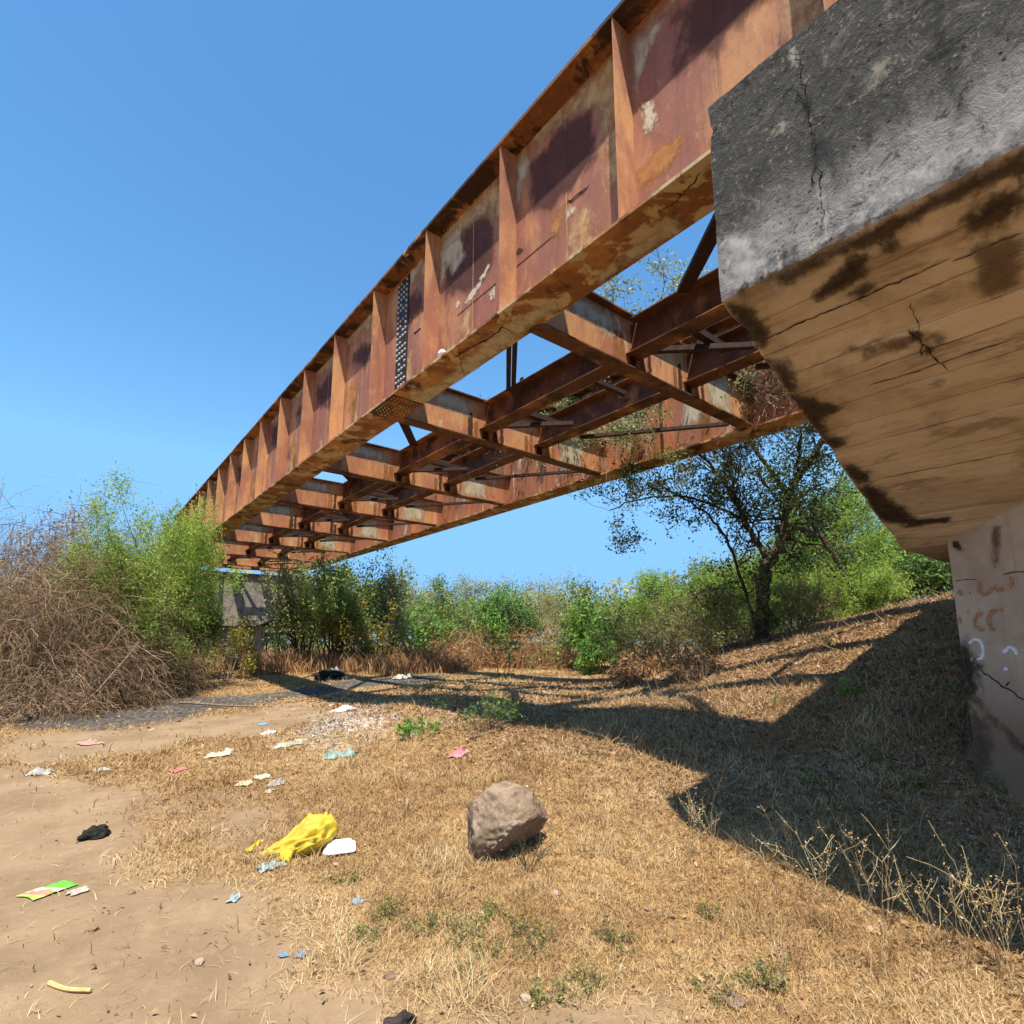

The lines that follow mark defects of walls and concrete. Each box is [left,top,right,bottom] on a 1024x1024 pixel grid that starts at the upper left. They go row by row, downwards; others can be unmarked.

rust [670,0,763,72]
rust [520,57,617,253]
peeling [642,101,657,133]
crack [792,54,828,243]
rust [441,182,500,295]
damp [723,235,766,287]
crack [767,233,1022,385]
damp [777,132,1024,302]
rust [317,357,333,428]
damp [728,305,846,450]
damp [845,465,950,527]
crack [981,670,1024,700]